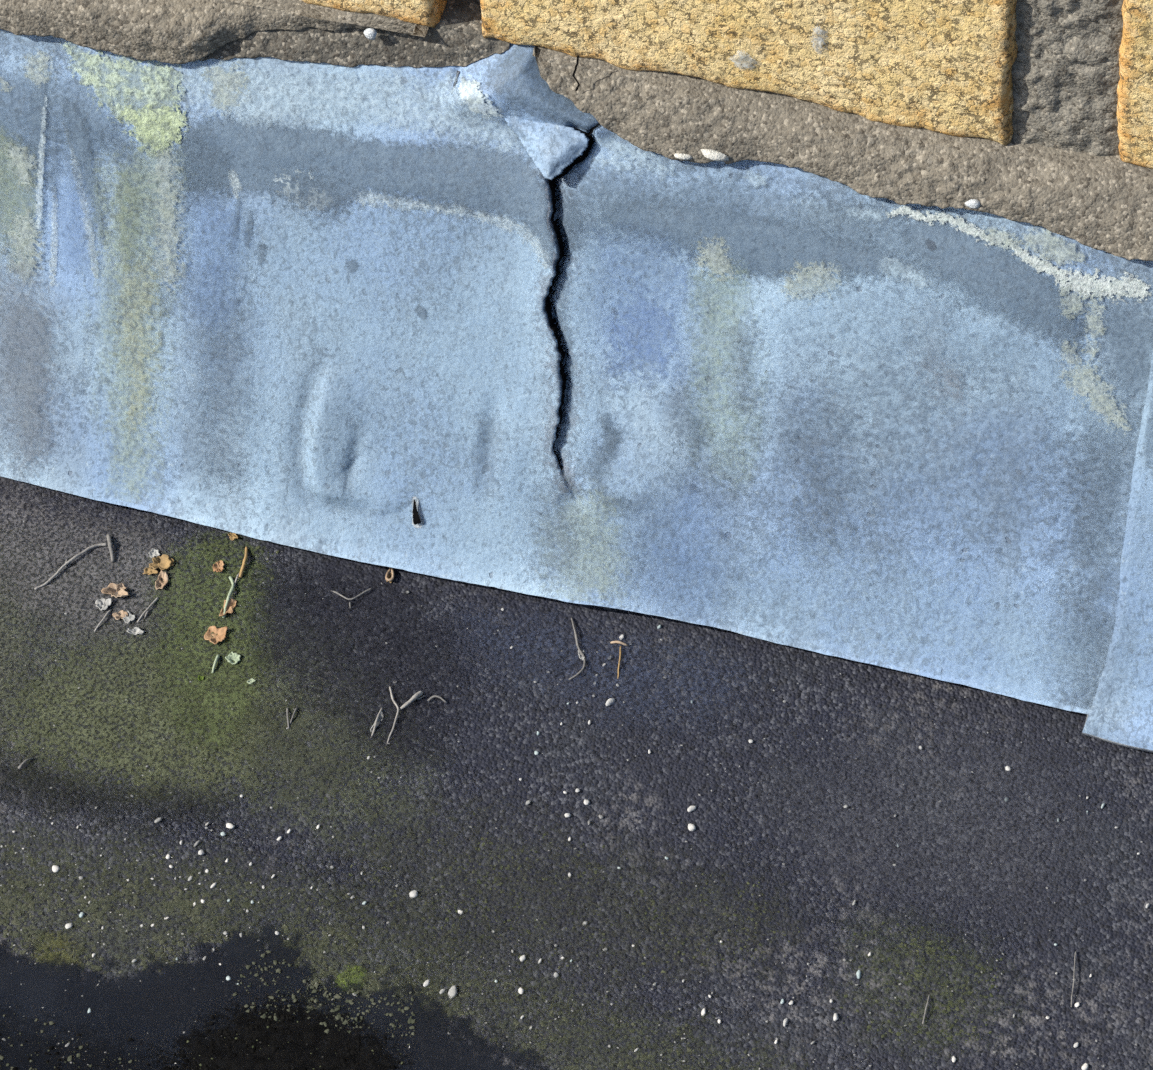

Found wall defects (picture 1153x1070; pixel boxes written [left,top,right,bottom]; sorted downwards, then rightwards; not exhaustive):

crack [572,56,580,91]
crack [502,116,600,493]
leakage [0,37,1153,708]